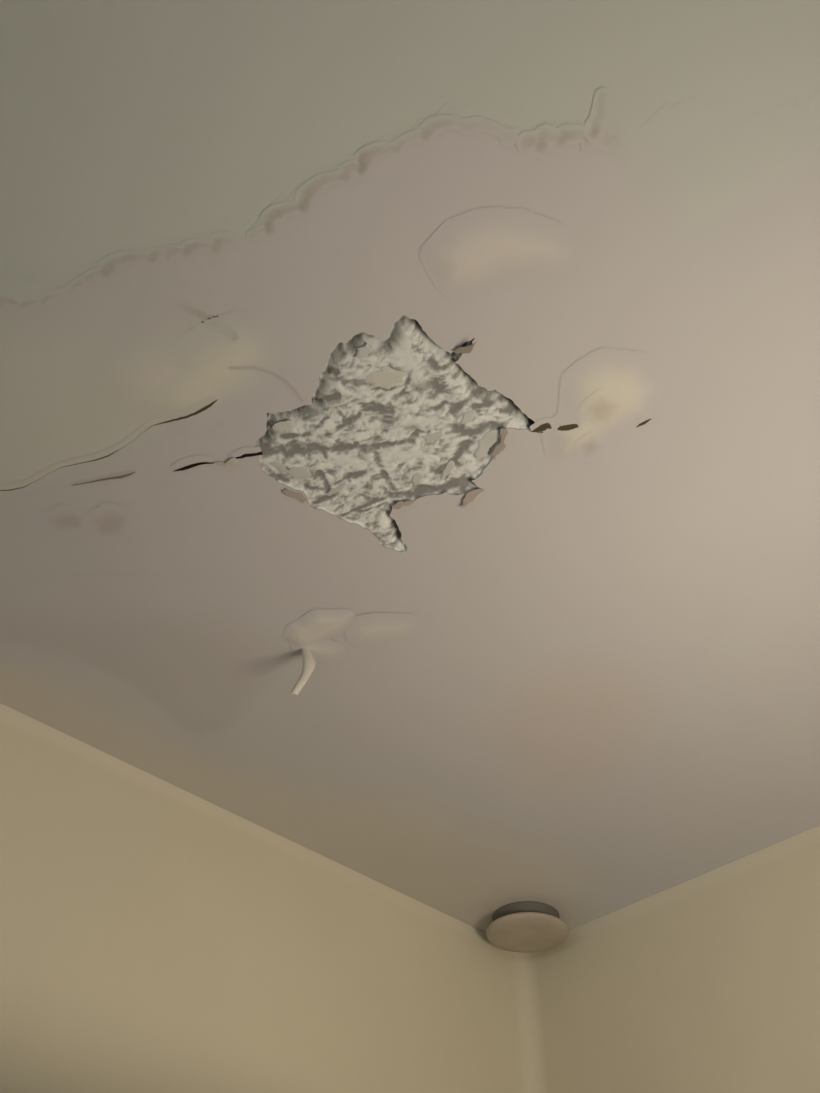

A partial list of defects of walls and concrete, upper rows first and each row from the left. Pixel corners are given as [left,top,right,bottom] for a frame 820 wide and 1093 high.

crack [0,395,217,491]
crack [171,447,263,472]
flaking render [256,315,543,552]
crack [530,418,581,432]
crack [633,414,652,428]
water stain [0,87,820,933]